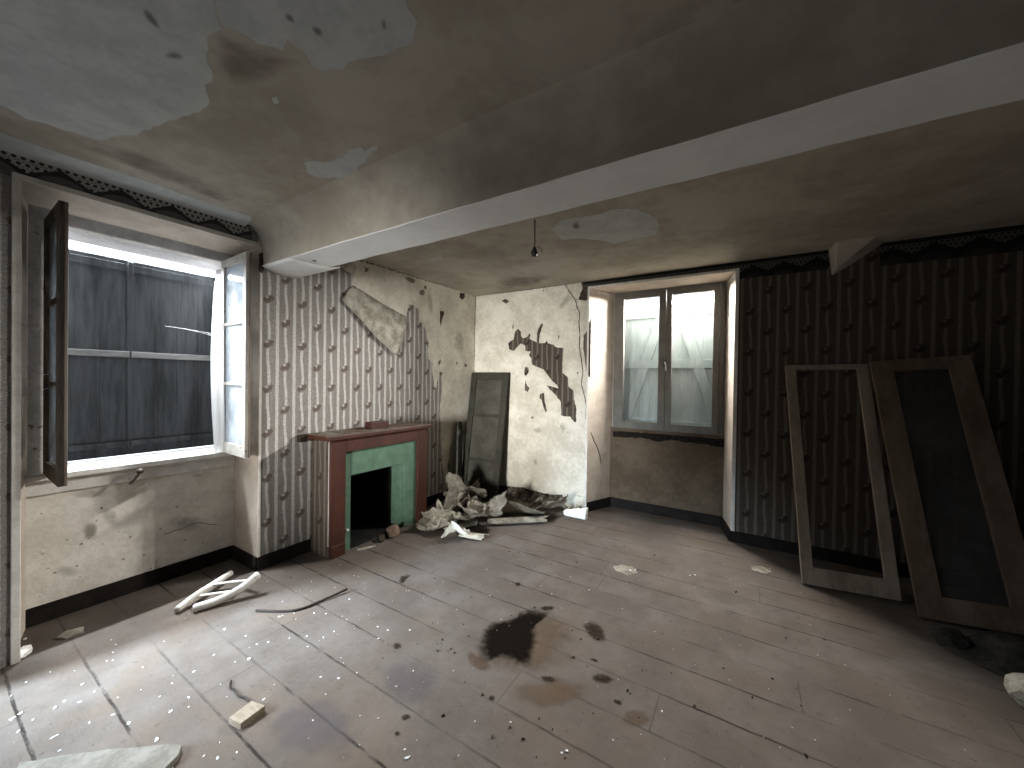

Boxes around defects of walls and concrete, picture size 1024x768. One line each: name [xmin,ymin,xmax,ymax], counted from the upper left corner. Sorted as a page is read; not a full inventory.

peeling [0,0,417,140]
peeling [305,145,378,179]
peeling [552,209,659,243]
peeling [340,261,591,509]
crack [543,284,601,461]